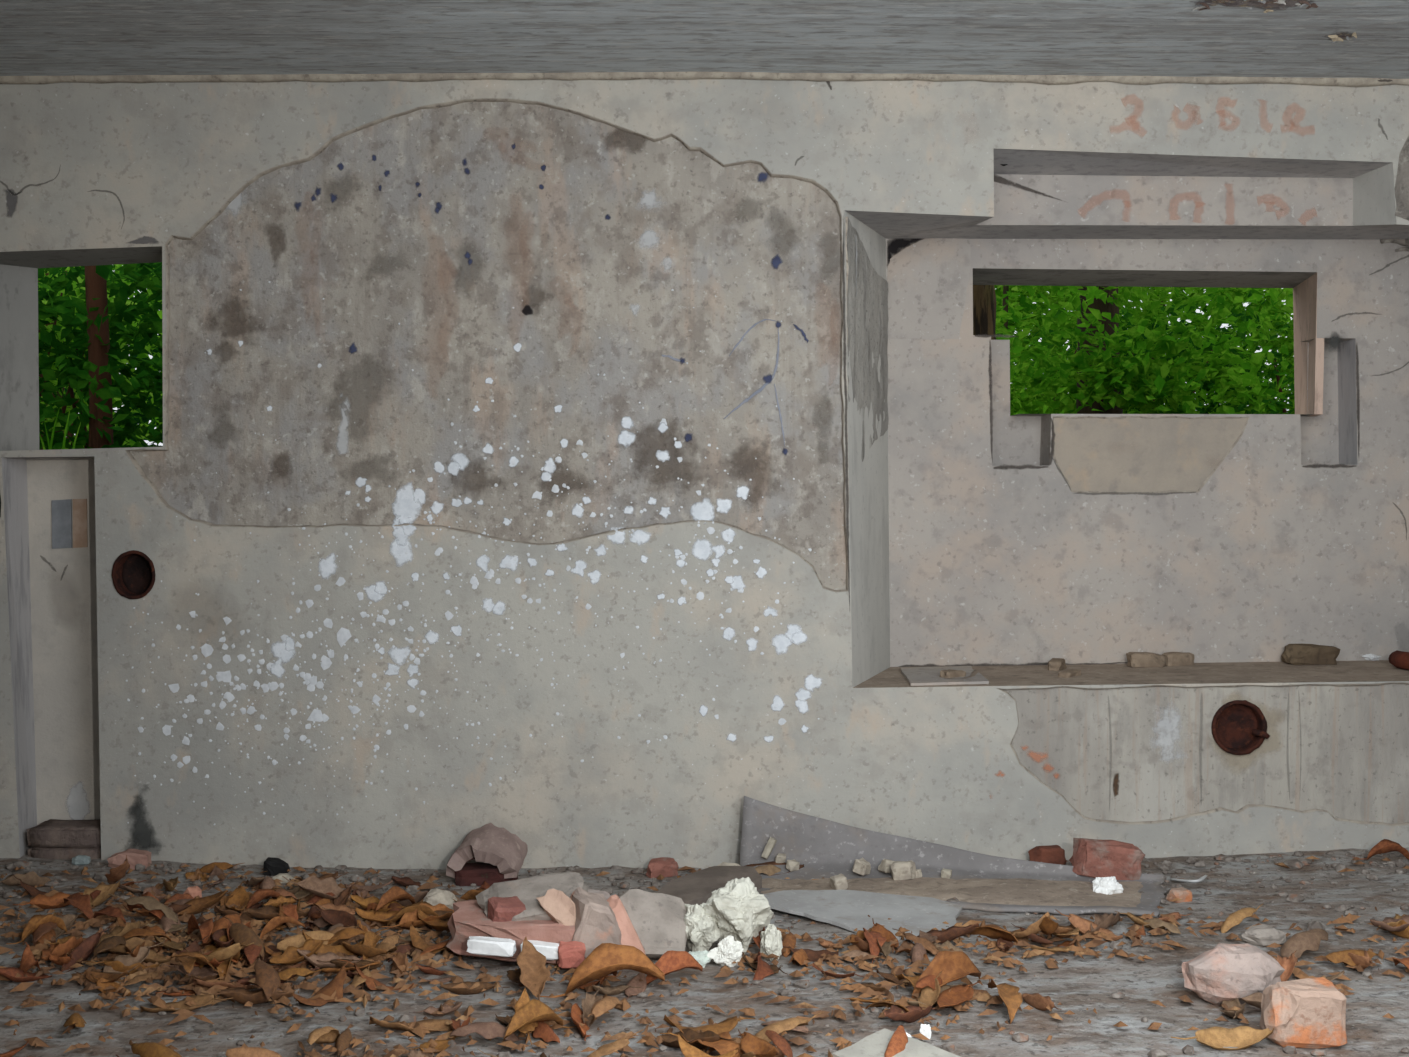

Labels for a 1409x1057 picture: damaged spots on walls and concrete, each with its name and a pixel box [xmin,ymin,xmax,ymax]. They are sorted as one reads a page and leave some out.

water stain [337,394,348,454]
flaking render [125,98,922,593]
flaking render [900,666,1409,826]